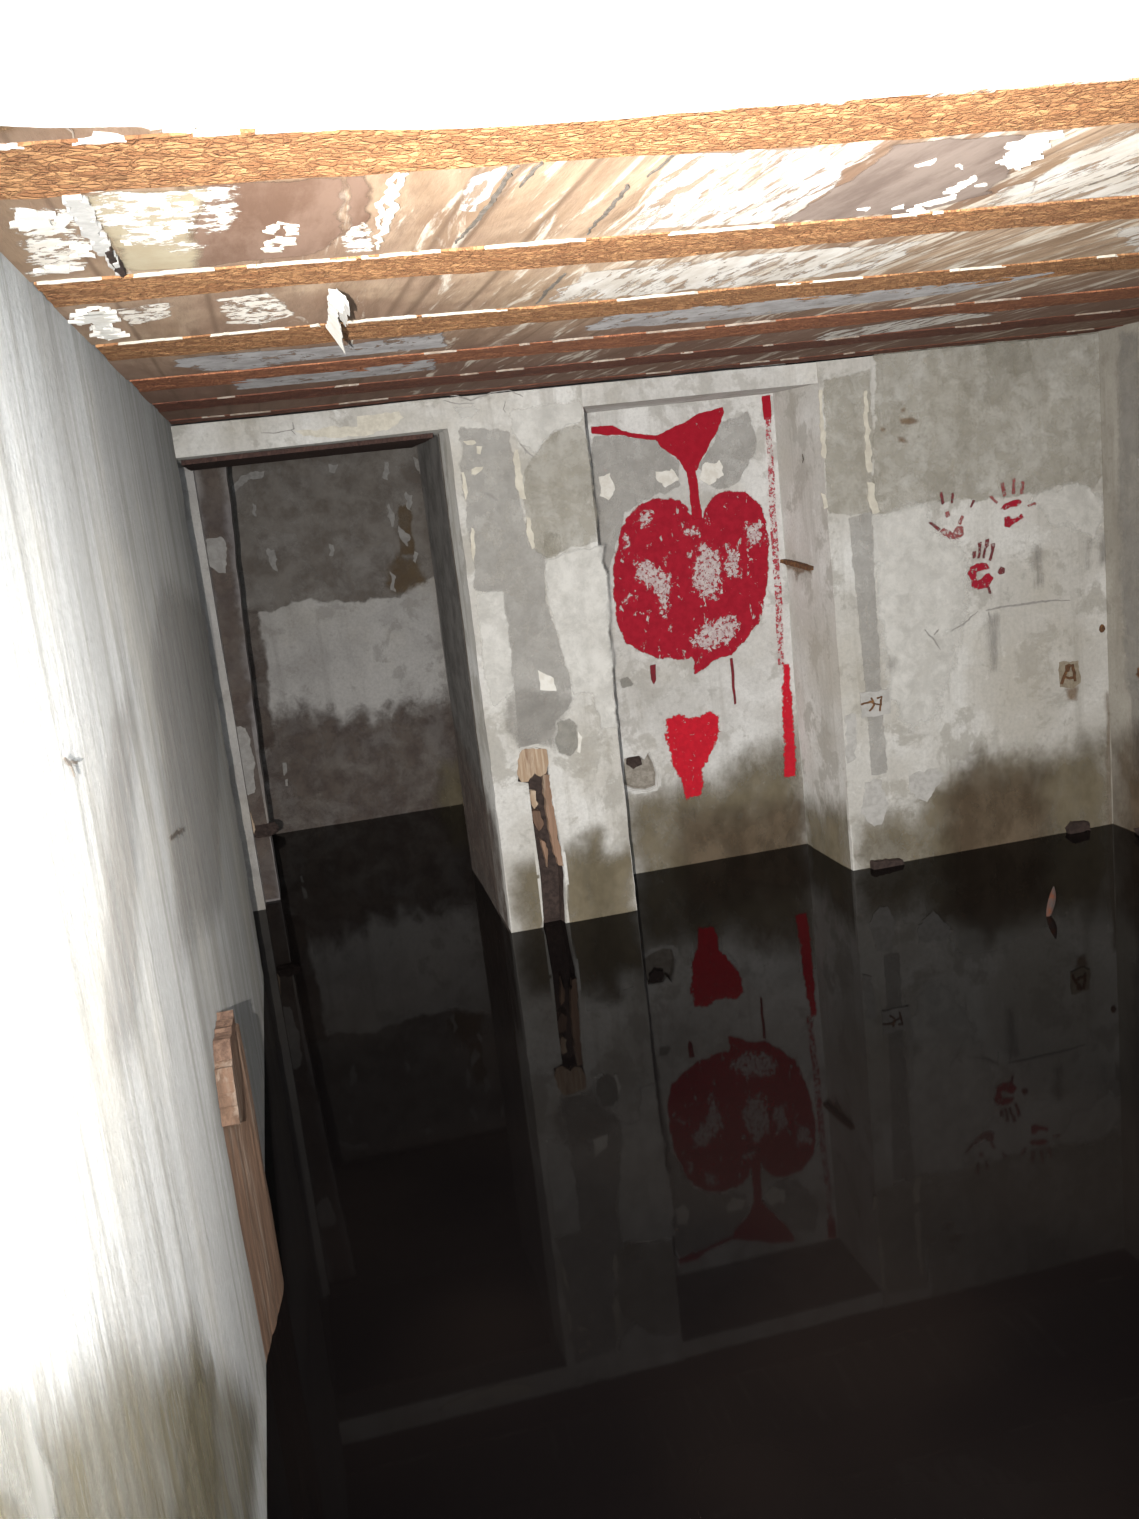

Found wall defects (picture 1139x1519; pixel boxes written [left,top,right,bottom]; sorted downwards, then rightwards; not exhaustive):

flaking render [0,143,24,151]
flaking render [72,131,126,146]
flaking render [143,127,339,137]
peeling [892,130,1139,218]
peeling [9,186,241,285]
flaking render [485,238,586,249]
peeling [68,303,183,345]
peeling [175,288,508,438]
water stain [850,337,1104,692]
water stain [154,435,543,934]
peeling [459,428,680,924]
water stain [565,715,1139,923]